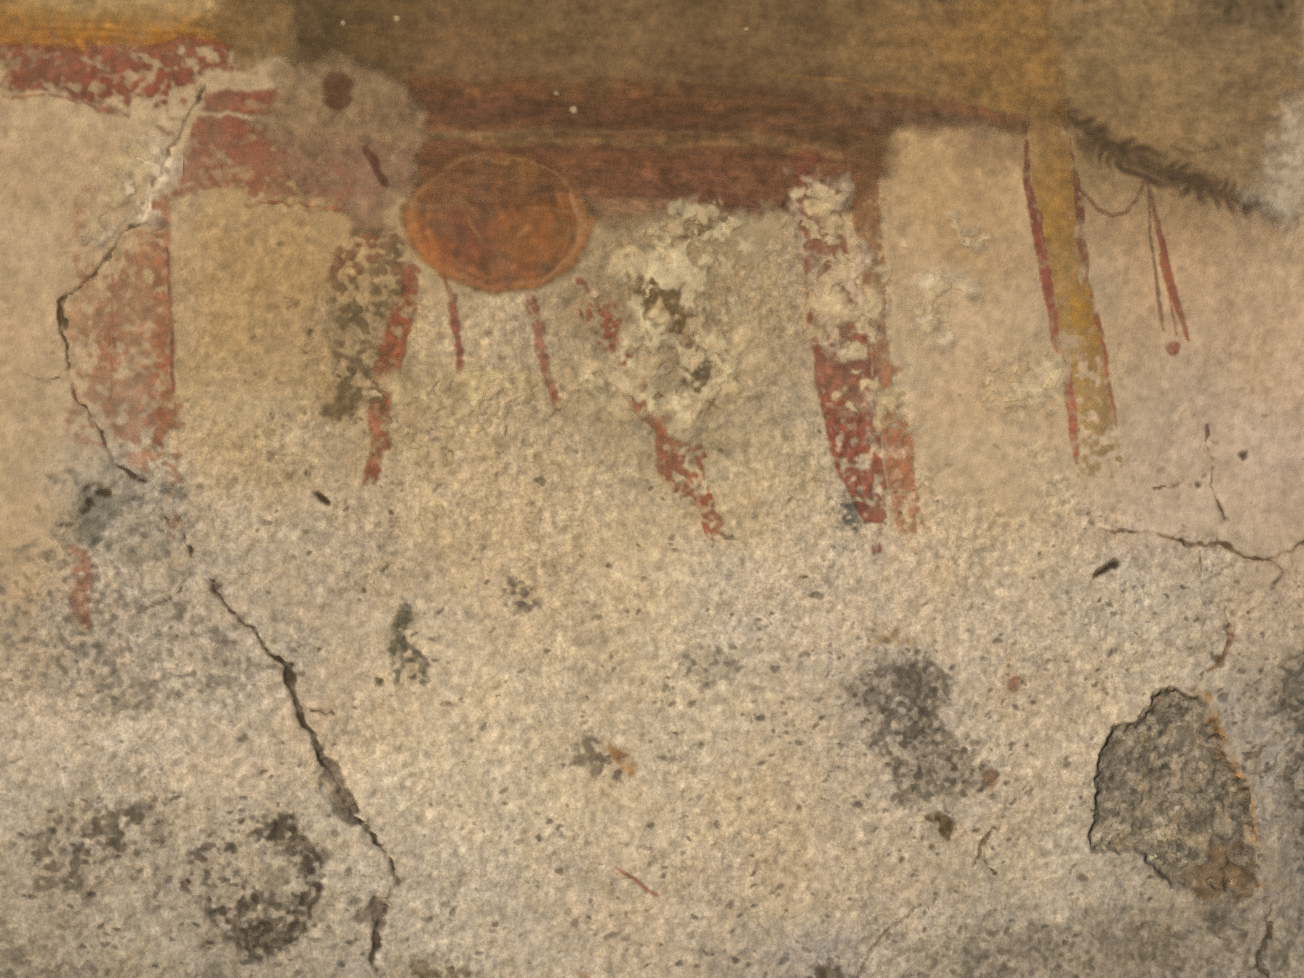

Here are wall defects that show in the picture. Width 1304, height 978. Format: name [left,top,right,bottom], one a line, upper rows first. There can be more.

crack [57,223,145,482]
crack [147,580,395,971]
damp [251,816,318,887]
damp [939,722,967,754]
spalling [1089,688,1255,901]